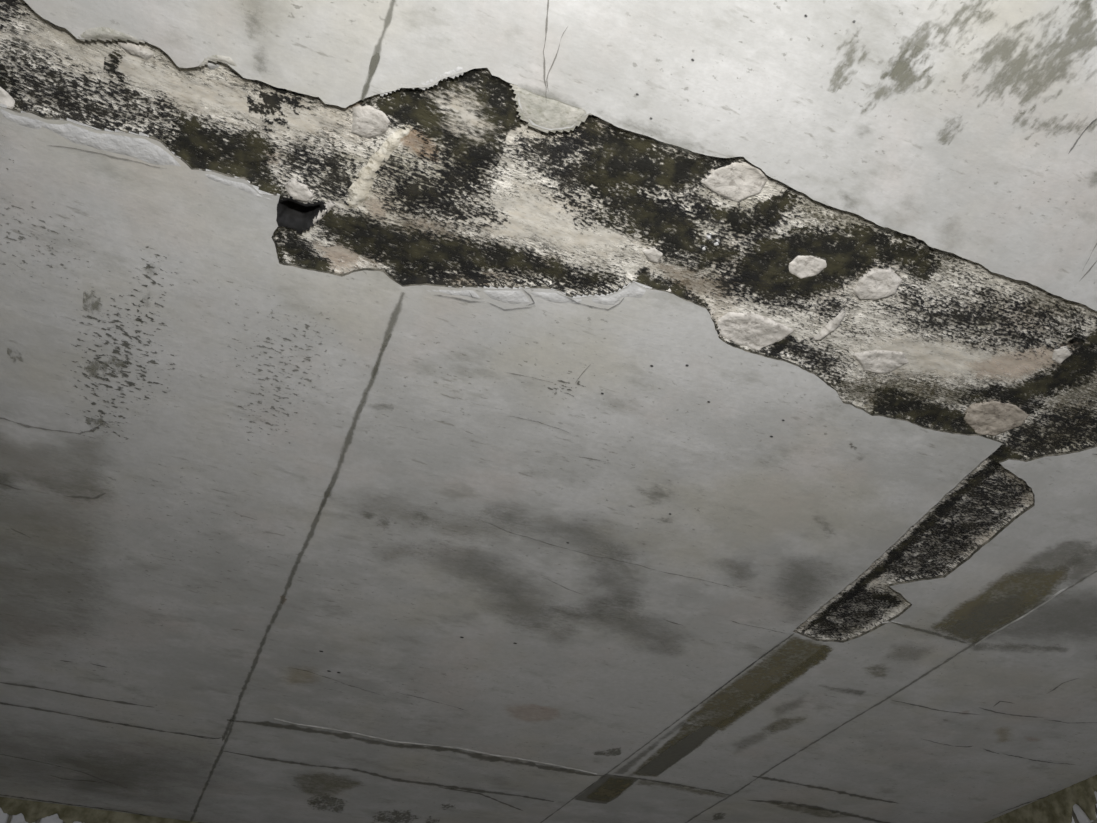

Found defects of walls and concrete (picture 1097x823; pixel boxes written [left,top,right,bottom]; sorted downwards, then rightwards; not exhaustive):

leakage [833,42,866,90]
leakage [875,2,992,98]
leakage [982,0,1097,102]
leakage [71,247,174,438]
spalling [0,0,1097,643]
leakage [935,567,1067,642]
leakage [576,637,831,804]